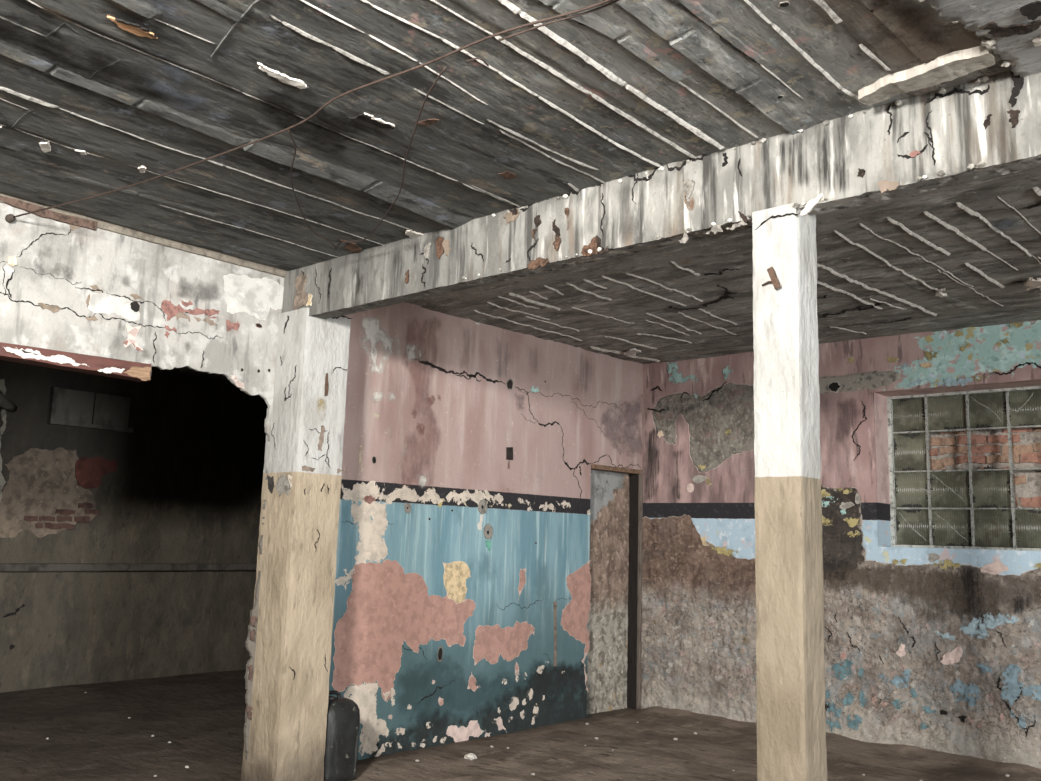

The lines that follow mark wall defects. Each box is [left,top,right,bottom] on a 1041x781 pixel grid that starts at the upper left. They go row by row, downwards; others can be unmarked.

spalling [878,180,900,194]
crack [0,228,221,368]
peeling [161,273,313,338]
peeling [4,347,151,381]
crack [412,358,726,500]
crack [851,401,867,460]
flaking render [0,447,100,538]
peeling [822,487,861,537]
peeling [332,468,571,757]
peeling [561,560,591,692]
peeling [933,613,1019,665]
peeling [825,652,984,732]